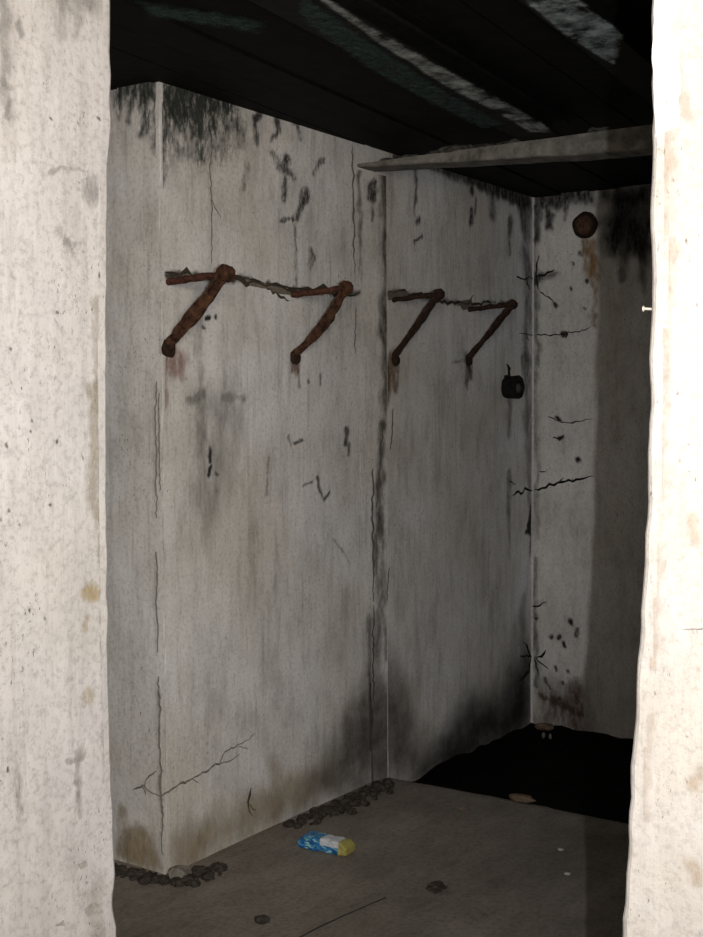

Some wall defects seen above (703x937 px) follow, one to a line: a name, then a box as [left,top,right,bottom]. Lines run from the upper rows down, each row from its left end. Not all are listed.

leakage [117,82,241,160]
leakage [252,112,262,144]
leakage [277,154,293,201]
leakage [281,188,310,222]
leakage [357,171,387,411]
crack [153,381,161,518]
crack [510,471,591,496]
crack [153,552,161,652]
crack [133,677,254,855]